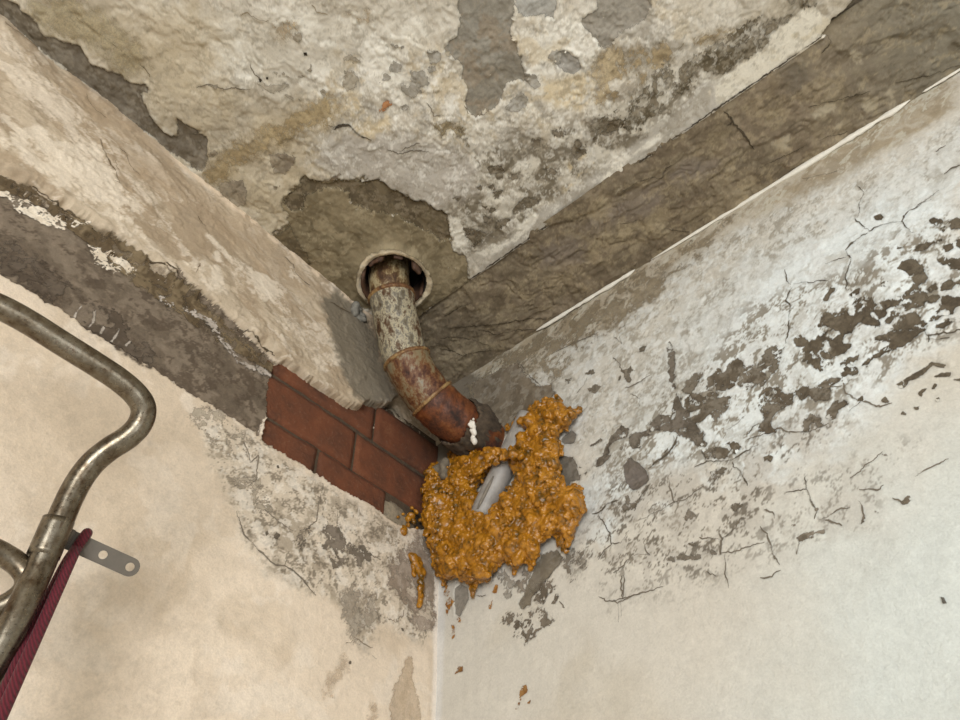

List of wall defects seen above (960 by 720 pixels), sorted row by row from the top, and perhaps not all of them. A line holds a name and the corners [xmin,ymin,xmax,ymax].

flaking render [382,0,557,117]
flaking render [548,50,581,74]
flaking render [582,0,653,49]
crack [621,35,848,193]
flaking render [284,173,450,241]
crack [784,145,960,342]
flaking render [0,188,438,530]
peeling [559,217,960,511]
crack [829,383,891,407]
crack [236,512,316,595]
crack [592,417,829,622]
crack [788,452,903,526]